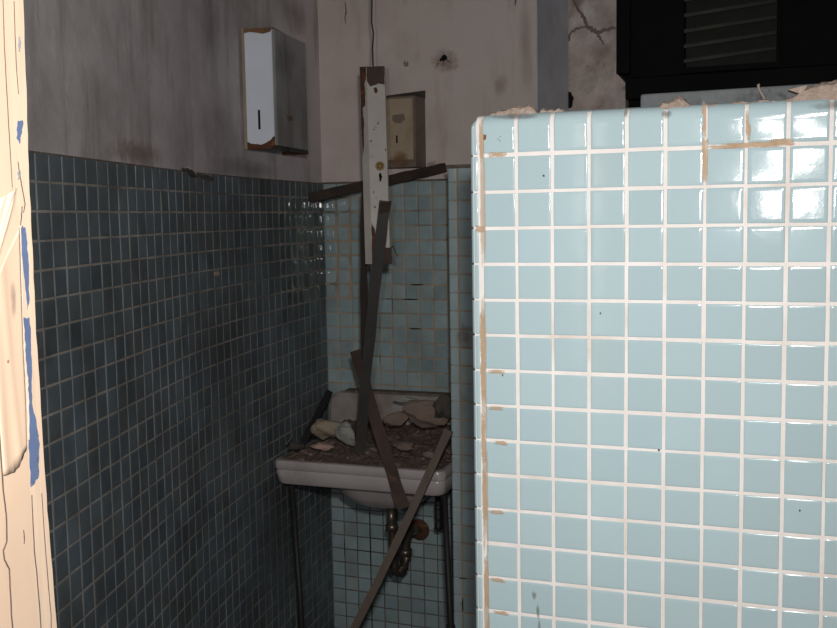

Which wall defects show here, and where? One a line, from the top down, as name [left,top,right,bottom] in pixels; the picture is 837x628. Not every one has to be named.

crack [568,0,616,45]
peeling [788,85,808,95]
peeling [0,187,30,475]